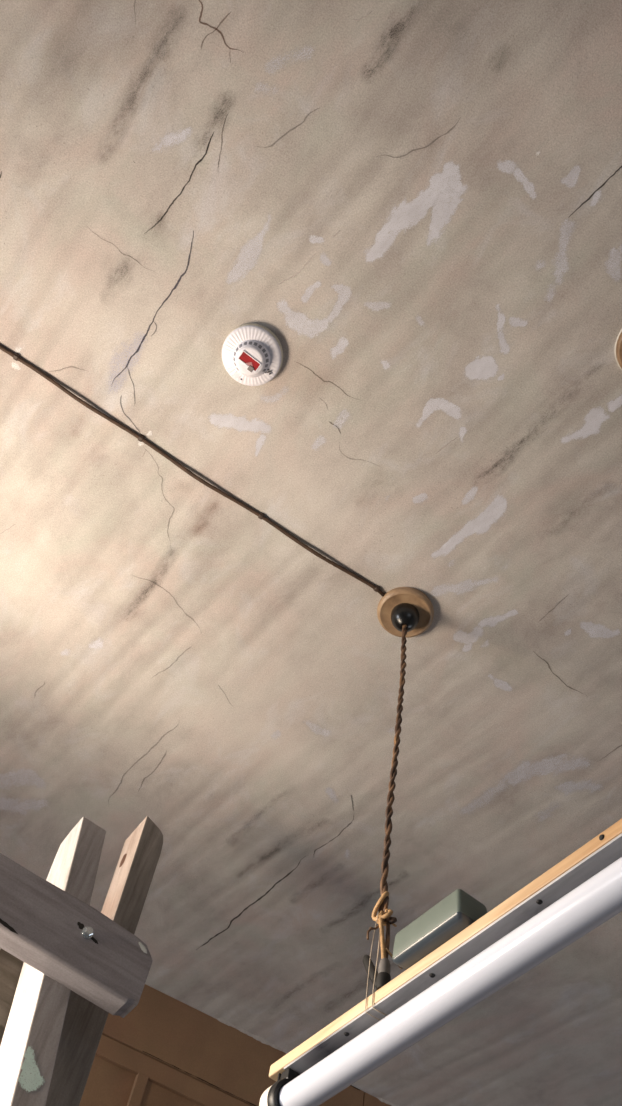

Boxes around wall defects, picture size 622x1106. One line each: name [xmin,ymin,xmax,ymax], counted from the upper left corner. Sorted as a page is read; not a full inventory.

crack [199,0,242,52]
crack [144,132,214,234]
peeling [363,159,468,262]
crack [569,166,622,217]
crack [113,231,194,432]
peeling [276,282,352,339]
peeling [561,394,622,444]
peeling [430,495,508,567]
crack [202,795,354,946]